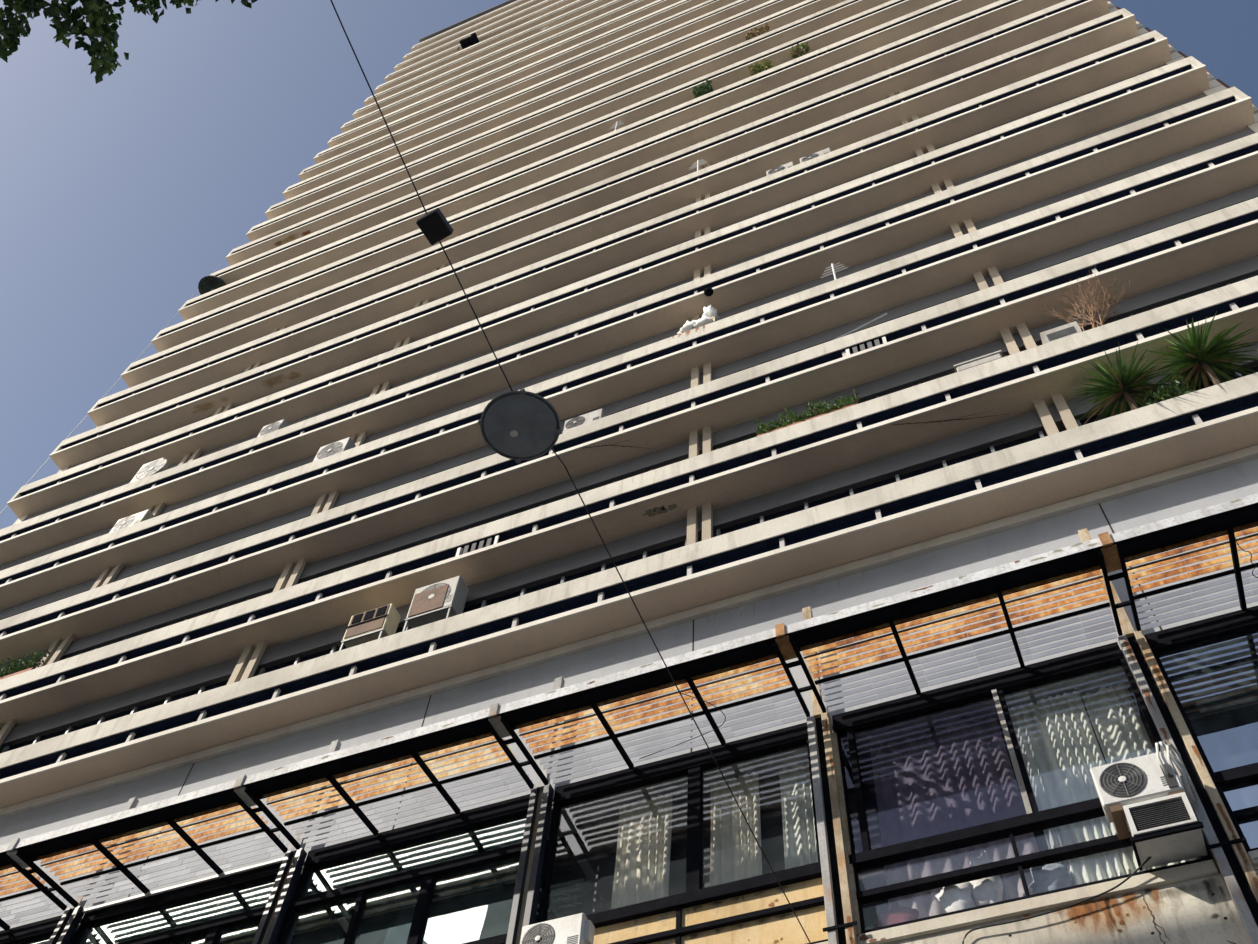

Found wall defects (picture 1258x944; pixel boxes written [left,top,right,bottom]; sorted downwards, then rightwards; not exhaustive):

rust [1057,888,1158,933]
crack [1141,893,1170,944]